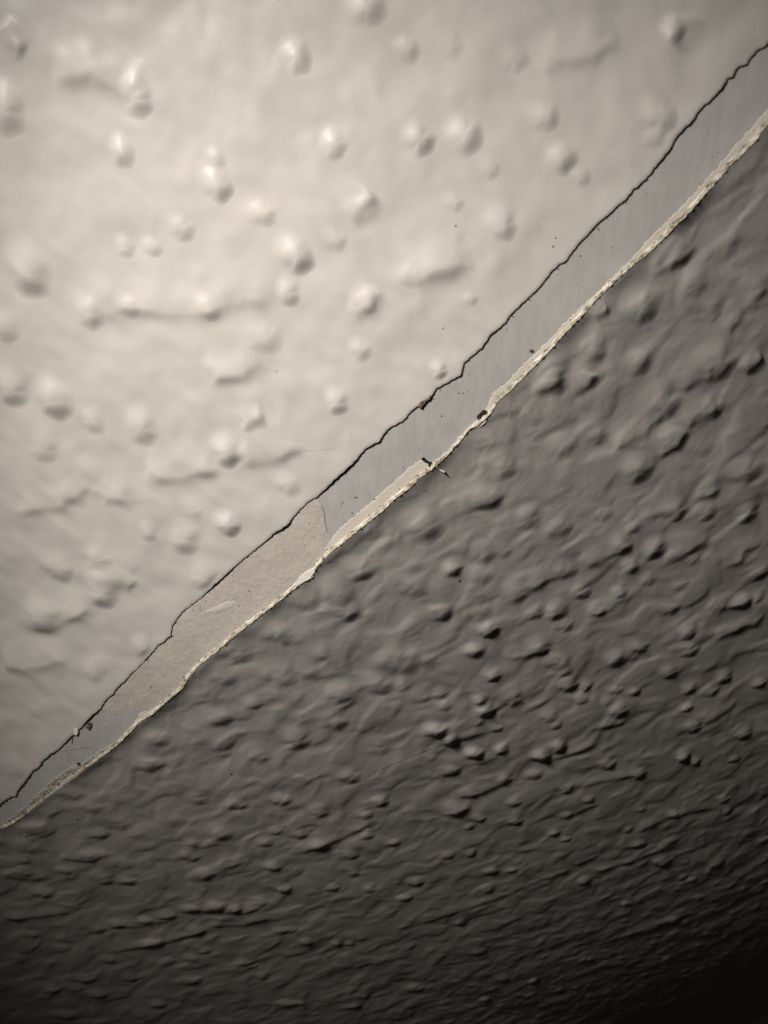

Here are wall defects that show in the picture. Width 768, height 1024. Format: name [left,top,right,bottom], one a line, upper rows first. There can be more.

crack [0,44,768,807]
peeling [0,46,768,829]